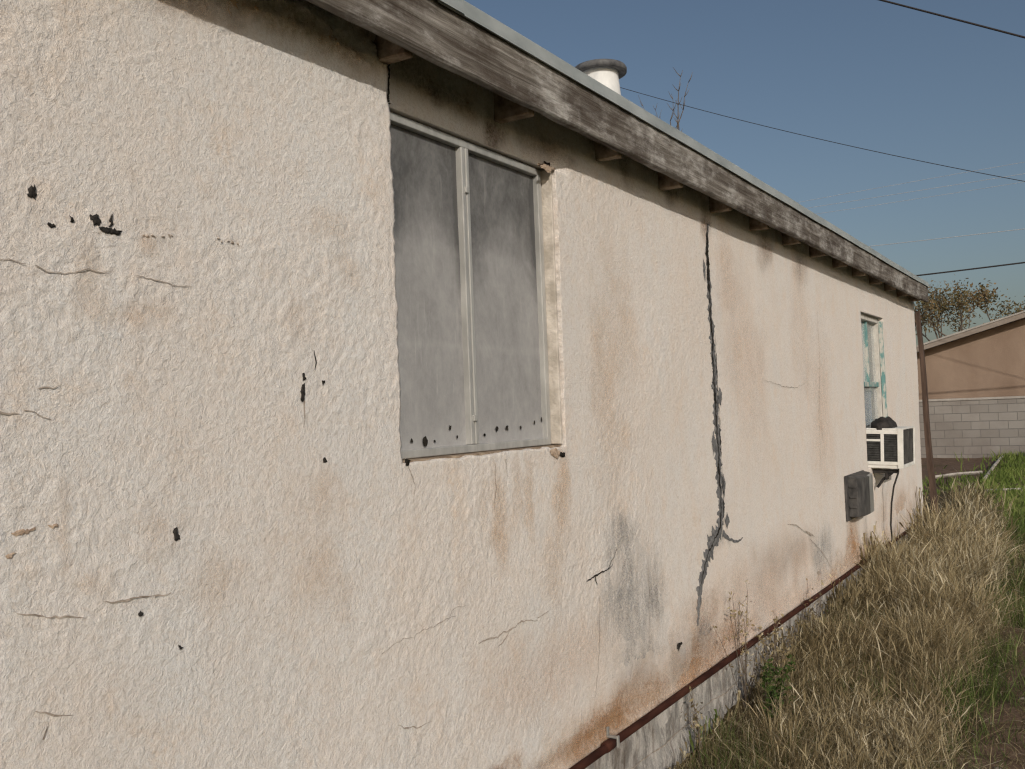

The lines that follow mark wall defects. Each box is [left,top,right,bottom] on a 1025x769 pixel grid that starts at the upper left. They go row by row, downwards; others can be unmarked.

crack [385,64,393,104]
peeling [89,214,122,235]
crack [0,258,112,274]
crack [0,384,62,420]
peeling [300,351,317,424]
crack [696,224,743,634]
crack [479,611,548,648]
crack [587,550,617,696]